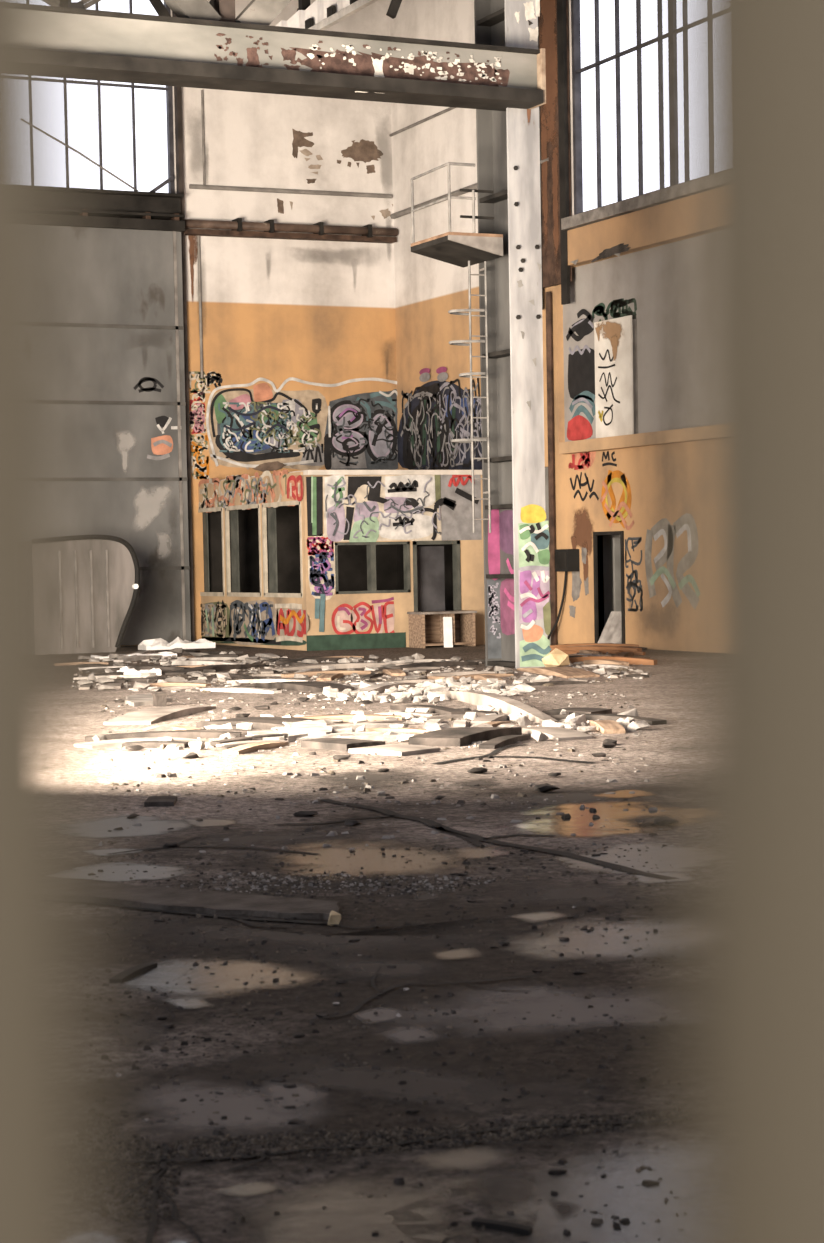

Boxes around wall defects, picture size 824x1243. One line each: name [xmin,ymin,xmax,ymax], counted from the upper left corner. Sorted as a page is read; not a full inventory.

peeling [292,129,383,184]